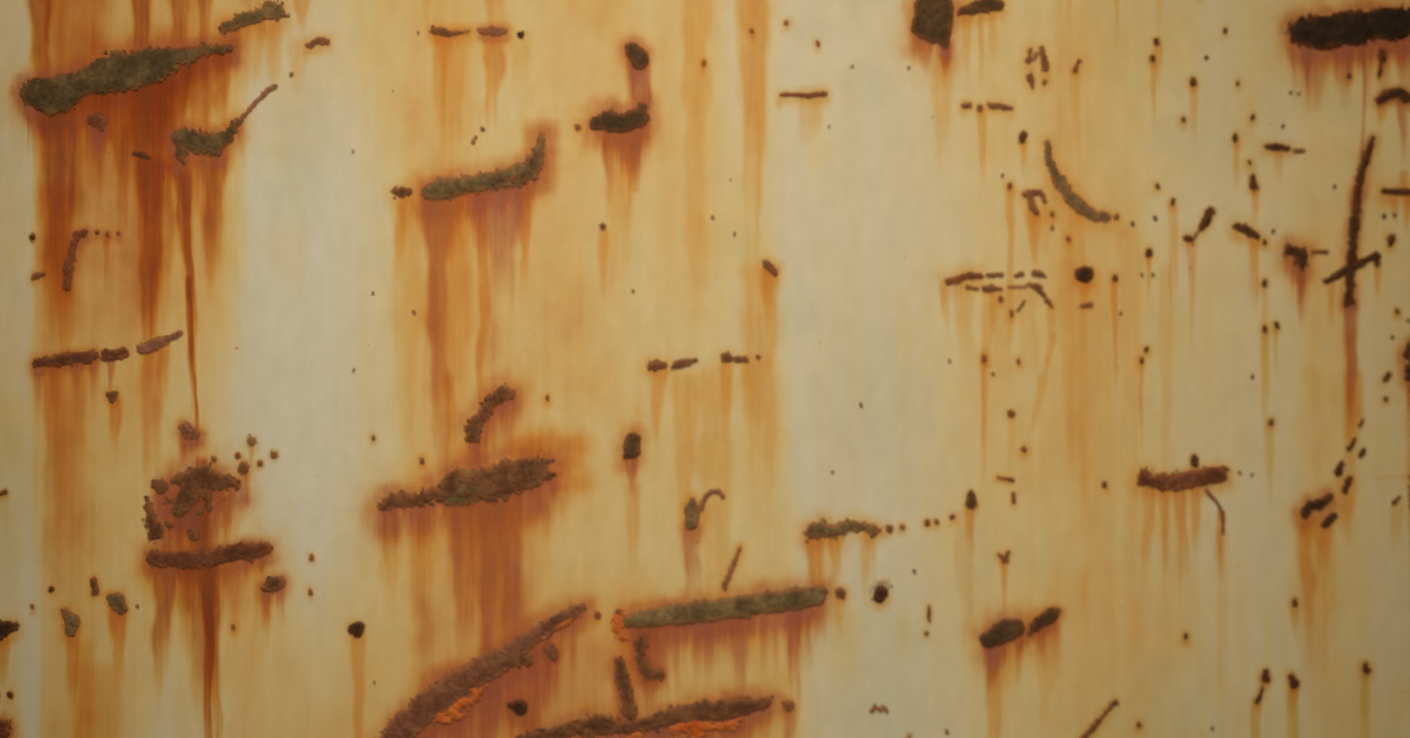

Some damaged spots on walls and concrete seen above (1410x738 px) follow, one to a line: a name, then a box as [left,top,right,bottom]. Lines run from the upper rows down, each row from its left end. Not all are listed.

rust [20,0,290,131]
rust [911,0,1004,48]
rust [1284,6,1410,104]
rust [171,72,293,164]
rust [575,102,649,133]
rust [390,134,545,200]
rust [1323,136,1396,307]
rust [142,434,277,569]
rust [378,454,556,510]
rust [1137,454,1253,534]
rust [380,585,845,738]
rust [979,607,1060,648]